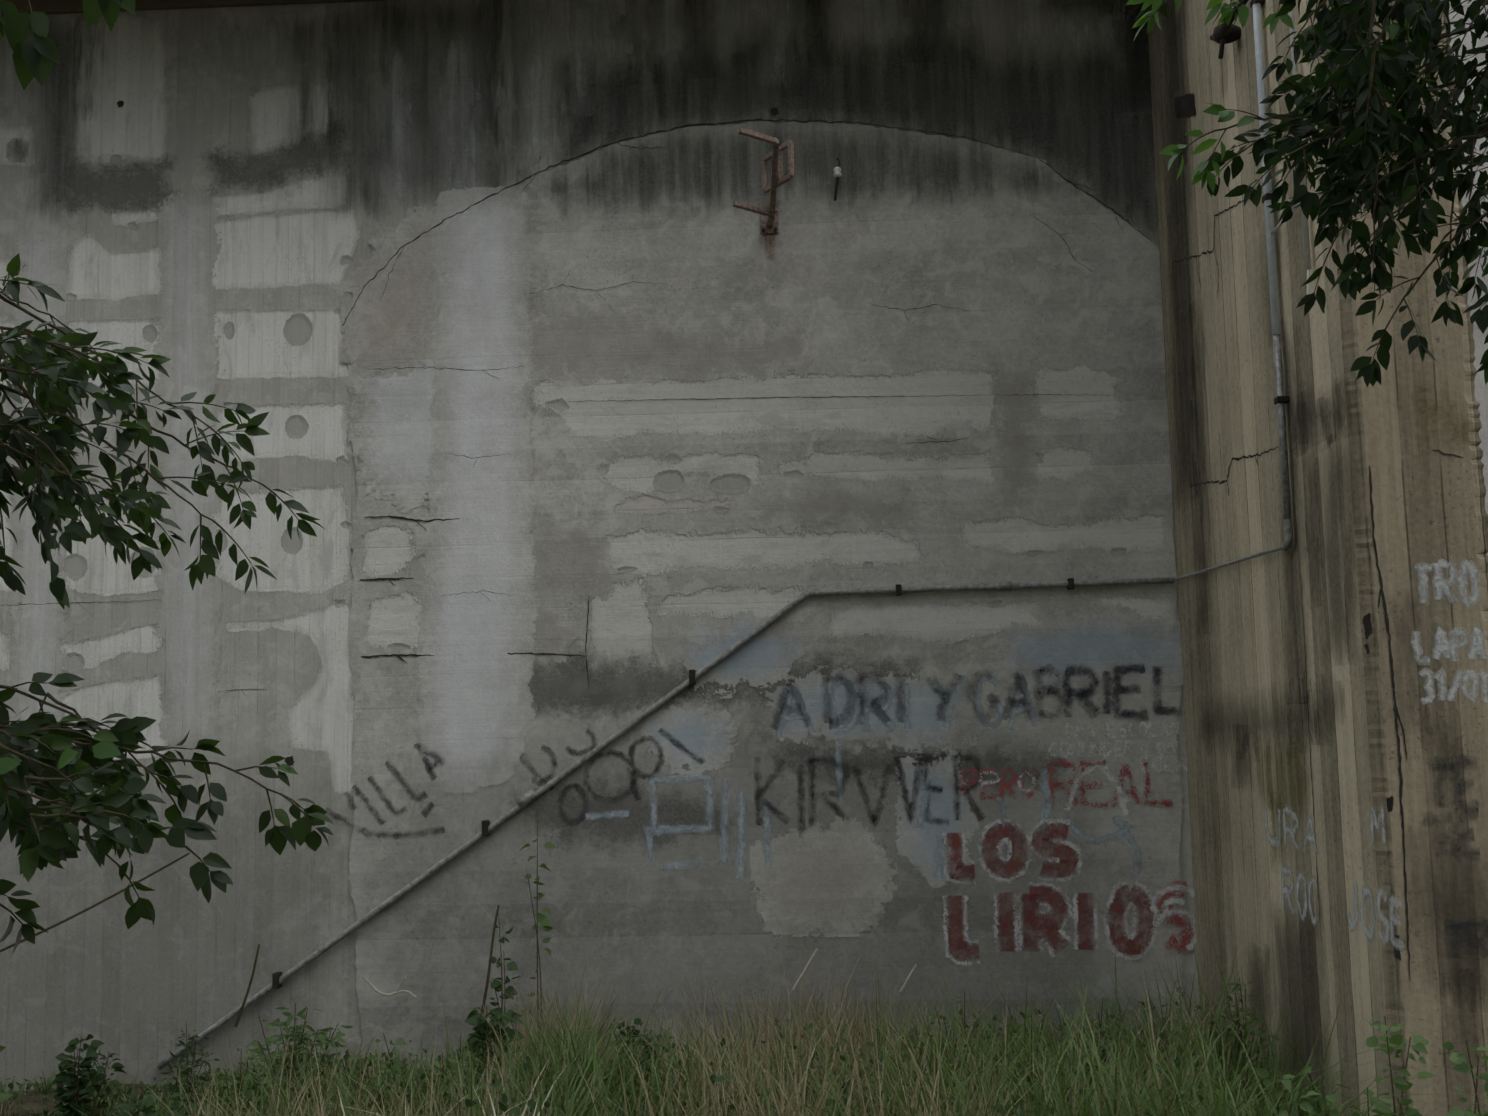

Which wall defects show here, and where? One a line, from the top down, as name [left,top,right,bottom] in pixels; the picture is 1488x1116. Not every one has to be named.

leakage [43,0,1204,797]
crack [343,118,1250,326]
crack [1188,447,1278,496]
crack [1369,466,1411,981]